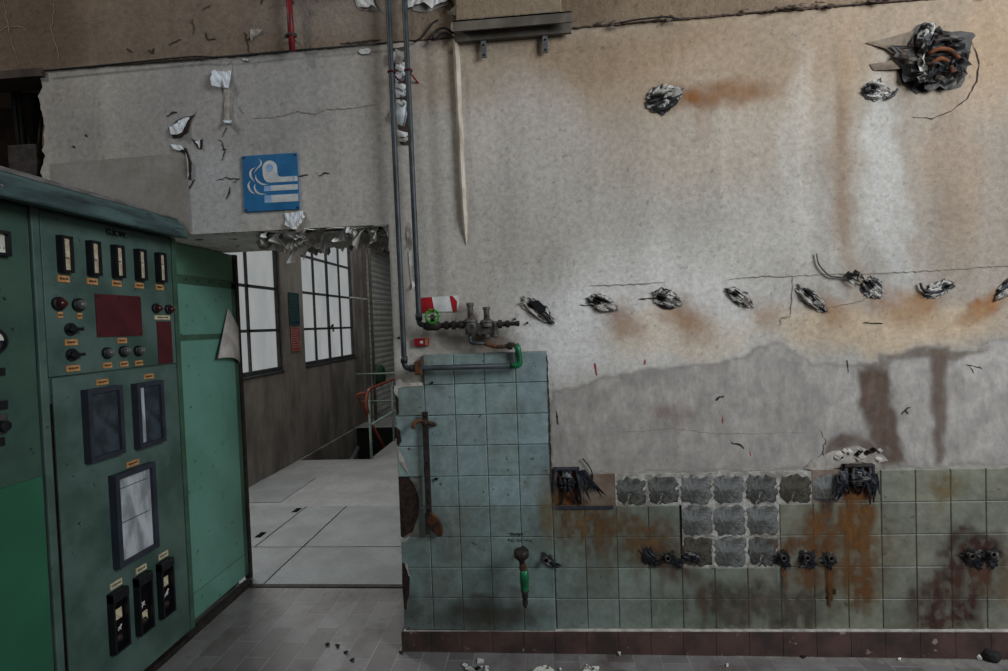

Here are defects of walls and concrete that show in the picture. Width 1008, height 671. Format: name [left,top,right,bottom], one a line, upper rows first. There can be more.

peeling [408,0,456,19]
peeling [210,58,250,124]
peeling [387,46,408,145]
hole [861,22,975,101]
crack [189,104,375,199]
peeling [255,210,389,263]
water stain [827,363,903,464]
water stain [909,349,964,461]
peeling [550,340,1008,587]
corrosion [562,505,672,557]
corrosion [782,489,876,607]